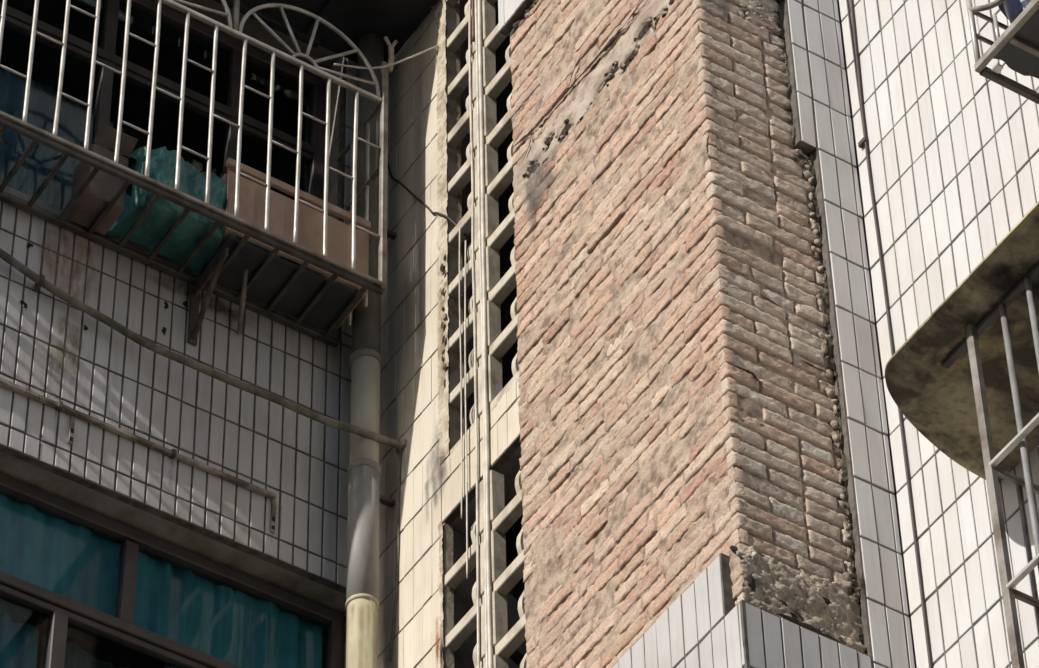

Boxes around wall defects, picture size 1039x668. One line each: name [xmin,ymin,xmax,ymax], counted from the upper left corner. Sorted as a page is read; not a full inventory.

spalling [790,149,821,252]
spalling [816,294,831,354]
spalling [825,370,841,449]
spalling [730,521,866,653]